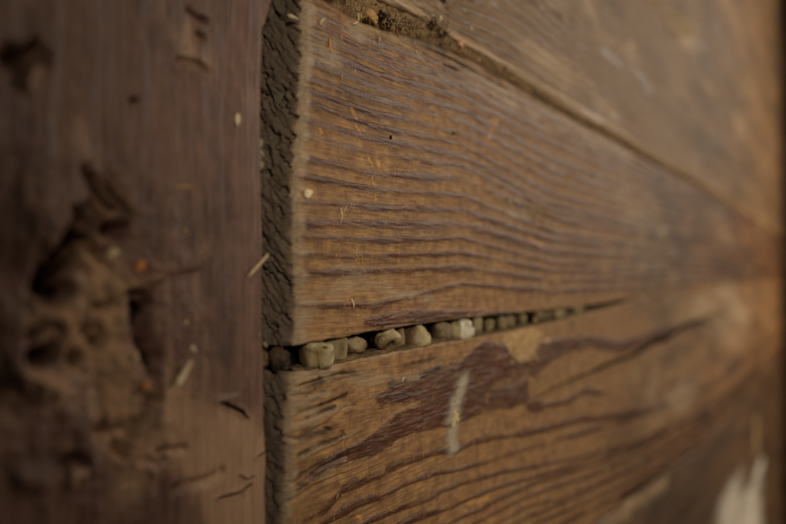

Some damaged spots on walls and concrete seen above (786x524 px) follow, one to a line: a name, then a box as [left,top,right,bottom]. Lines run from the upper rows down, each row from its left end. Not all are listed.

crack [531,311,721,398]
crack [220,402,250,419]
crack [215,451,265,501]